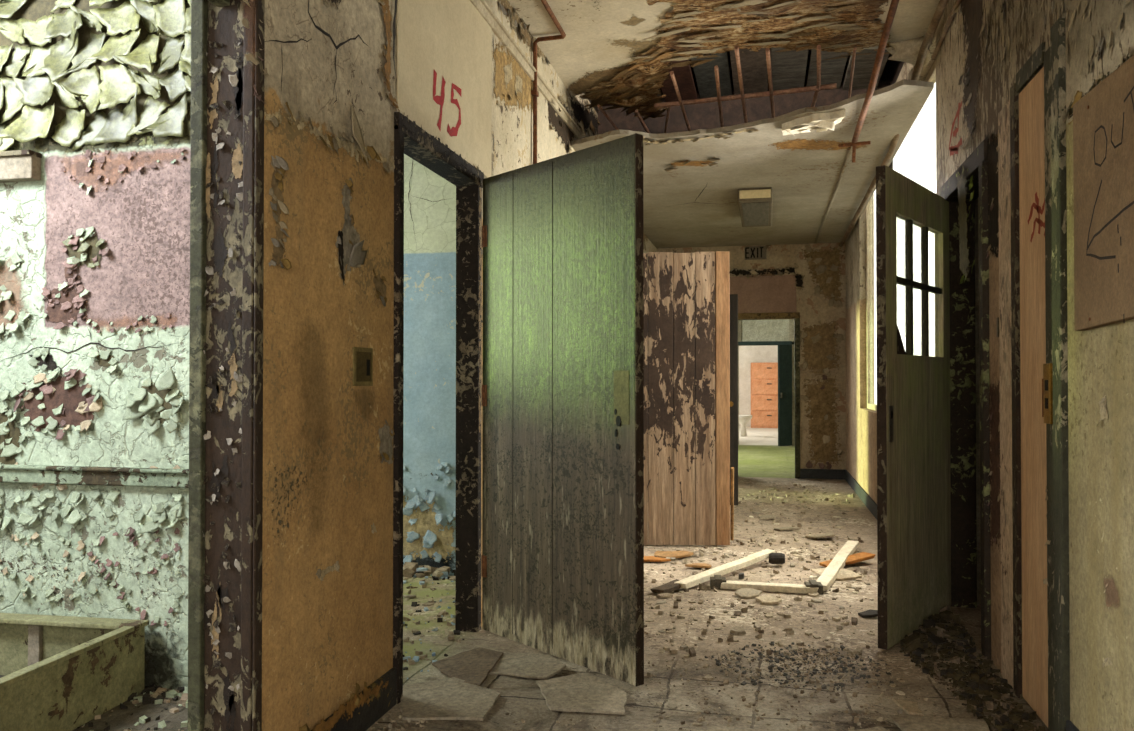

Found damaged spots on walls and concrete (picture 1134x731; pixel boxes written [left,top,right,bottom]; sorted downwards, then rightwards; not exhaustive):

crack [265,0,397,104]
spalling [493,0,931,153]
peeling [204,0,395,414]
peeling [0,226,176,336]
peeling [0,347,103,465]
peeling [86,349,118,373]
peeling [122,367,186,436]
peeling [203,428,242,506]
peeling [378,419,456,563]
peeling [202,542,241,731]